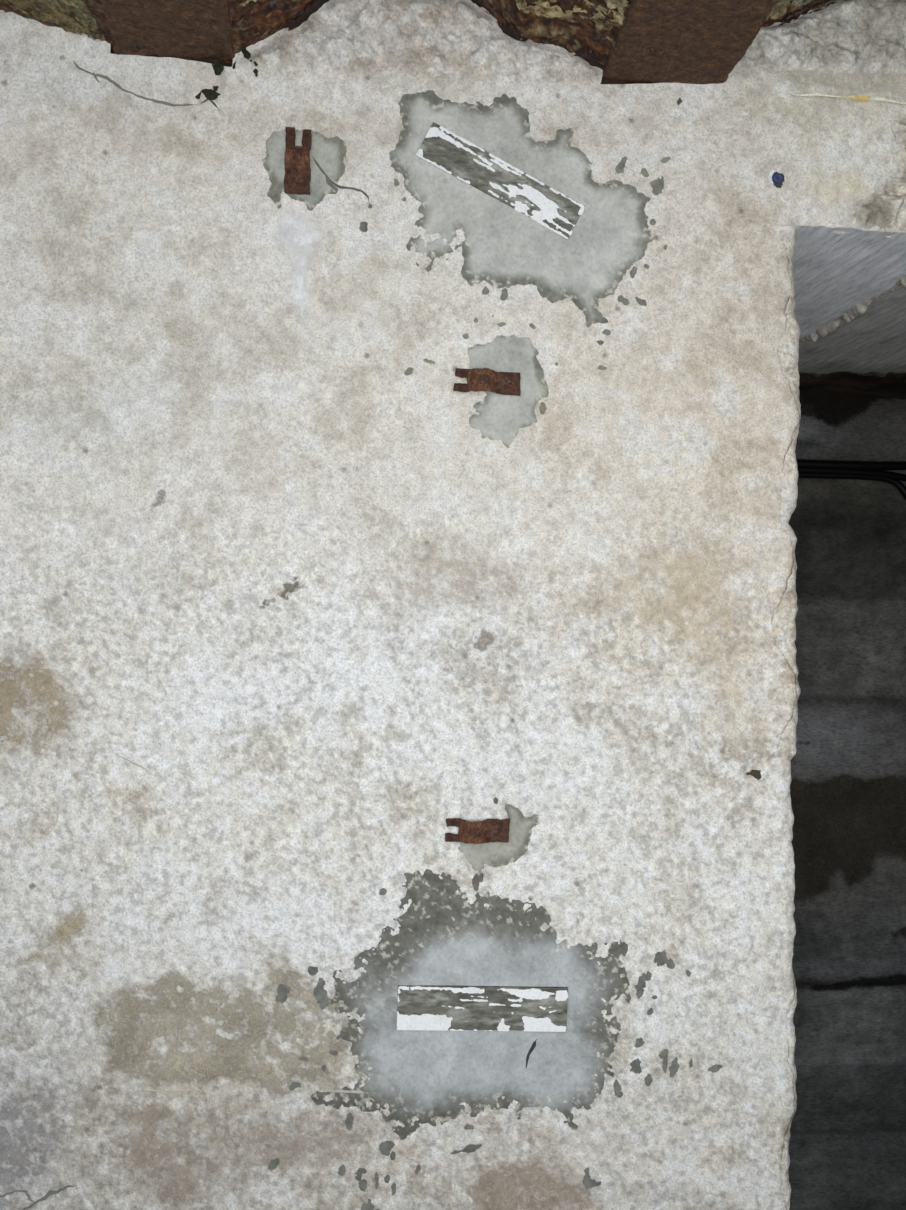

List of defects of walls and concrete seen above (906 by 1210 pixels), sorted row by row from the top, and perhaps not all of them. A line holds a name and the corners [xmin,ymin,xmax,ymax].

crack [73,61,220,111]
peeling [262,129,347,211]
peeling [389,90,671,345]
peeling [463,315,558,448]
leakage [799,388,891,426]
leakage [790,775,906,901]
peeling [289,797,693,1160]
leakage [810,974,906,991]
leakage [96,969,349,1095]
crack [0,1185,74,1210]
peeling [338,1165,396,1210]
peeling [583,1168,601,1189]